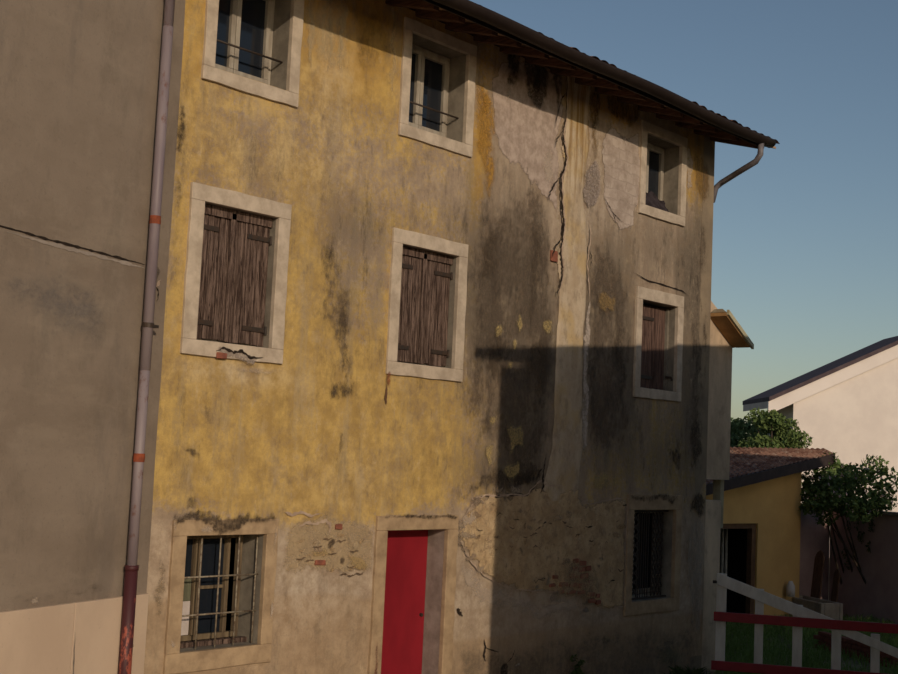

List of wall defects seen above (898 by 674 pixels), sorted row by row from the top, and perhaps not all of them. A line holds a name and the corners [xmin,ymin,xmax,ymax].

crack [0,225,145,268]
damp [471,196,550,493]
peeling [492,62,563,208]
crack [549,81,592,311]
peeling [583,128,640,230]
crack [635,273,685,293]
flaking render [458,464,629,609]